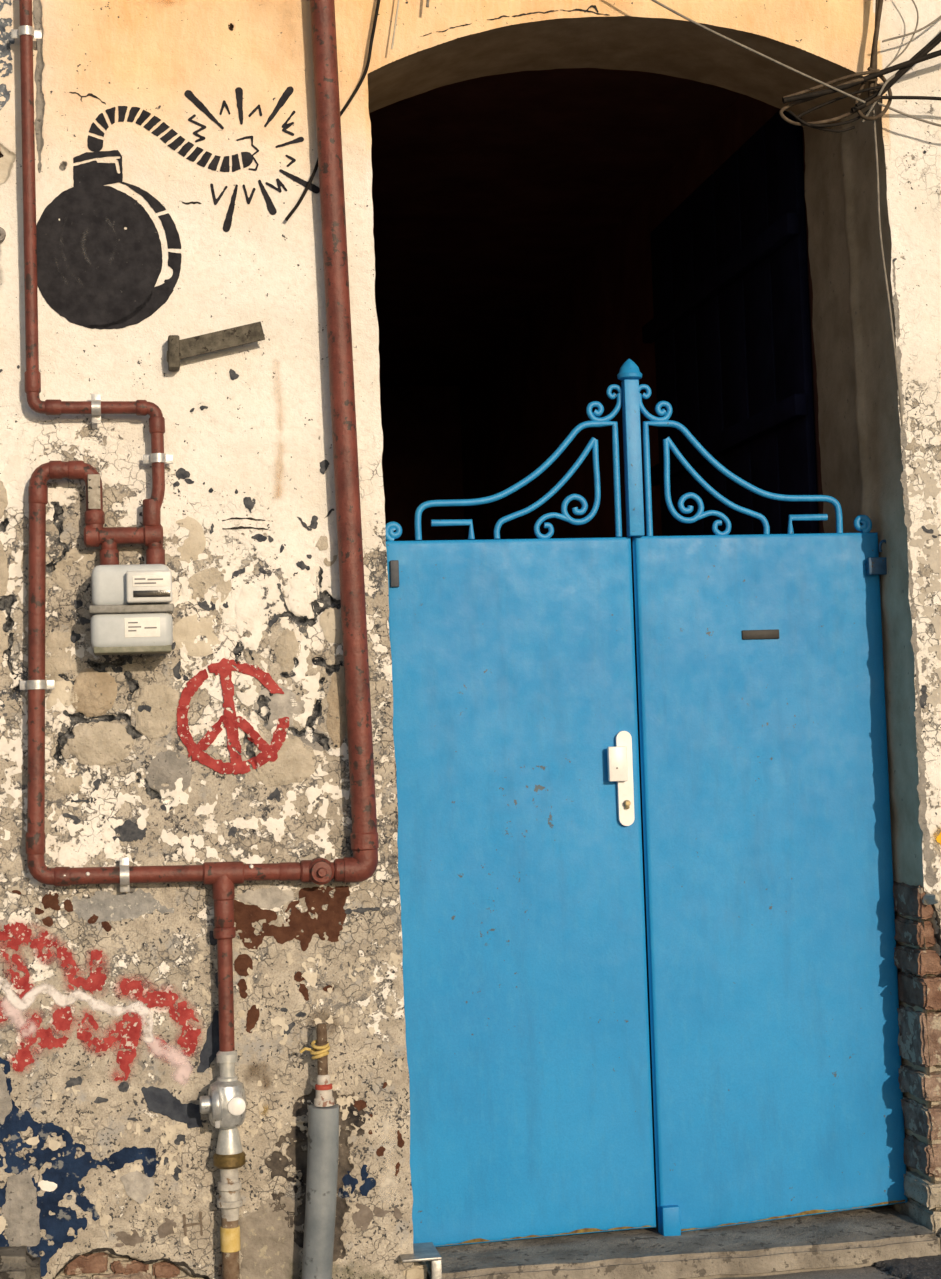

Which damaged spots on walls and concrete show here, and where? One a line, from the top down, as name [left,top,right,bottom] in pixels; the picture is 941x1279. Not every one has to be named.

peeling [0,0,15,110]
peeling [173,468,214,493]
peeling [174,534,287,643]
peeling [290,508,334,628]
peeling [0,699,28,840]
peeling [47,743,350,866]
spalling [892,258,941,1235]
peeling [236,885,294,909]
crack [931,904,941,959]
peeling [188,954,219,1073]
peeling [0,1057,212,1279]
spalling [238,1066,404,1279]